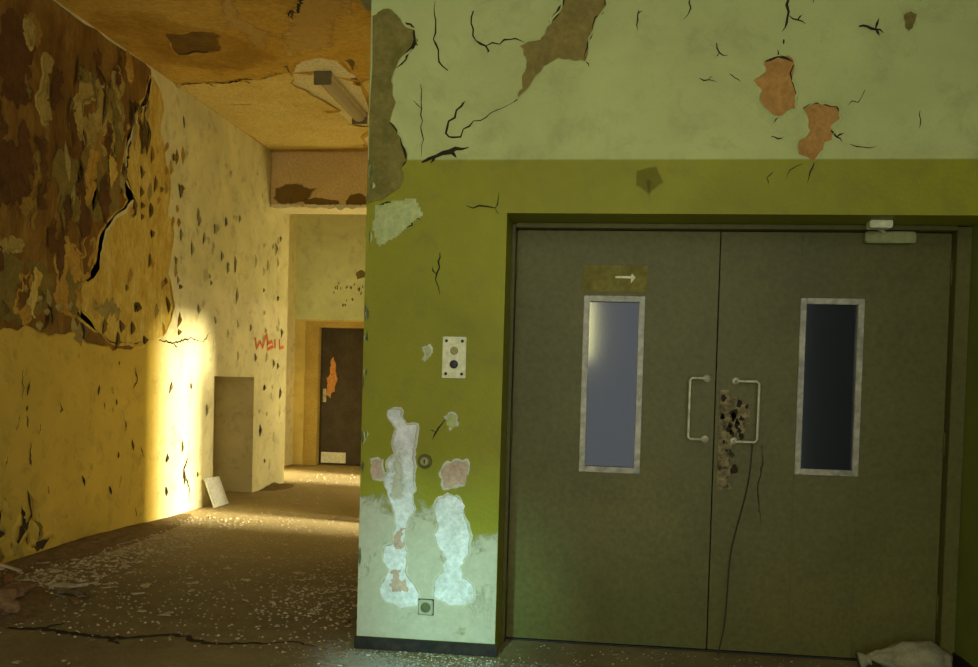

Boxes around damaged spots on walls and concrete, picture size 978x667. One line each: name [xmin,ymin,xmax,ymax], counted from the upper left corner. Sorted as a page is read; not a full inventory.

peeling [175,6,418,210]
crack [396,1,448,70]
crack [390,84,517,166]
crack [470,11,528,52]
peeling [515,0,609,102]
crack [699,43,740,82]
flaking render [752,53,844,163]
crack [765,0,876,148]
crack [859,19,884,36]
peeling [0,0,241,365]
peeling [0,491,62,573]
flaking render [361,407,477,610]